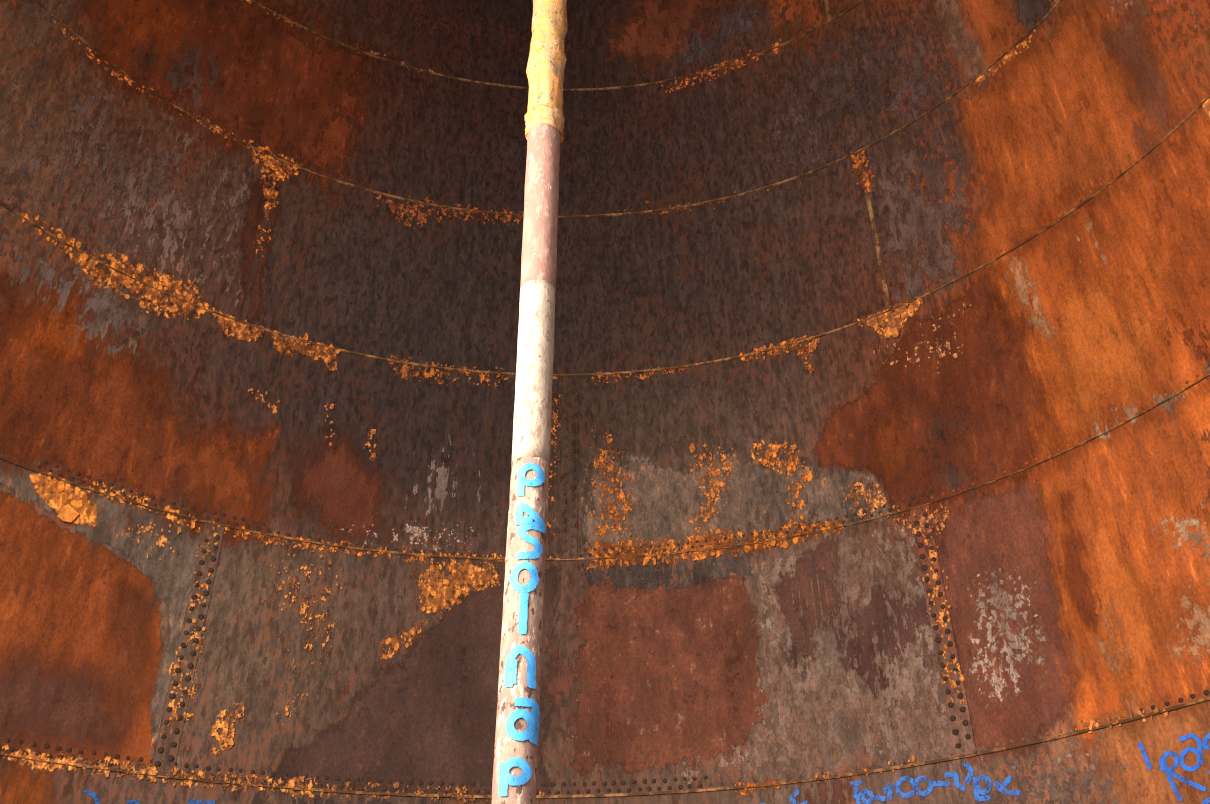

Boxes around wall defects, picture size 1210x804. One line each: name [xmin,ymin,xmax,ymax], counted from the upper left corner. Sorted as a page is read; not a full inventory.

rust [0,207,516,804]
rust [375,192,524,229]
rust [536,556,561,804]
rust [547,395,562,537]
peeling [569,122,1057,786]
rust [587,0,1210,804]